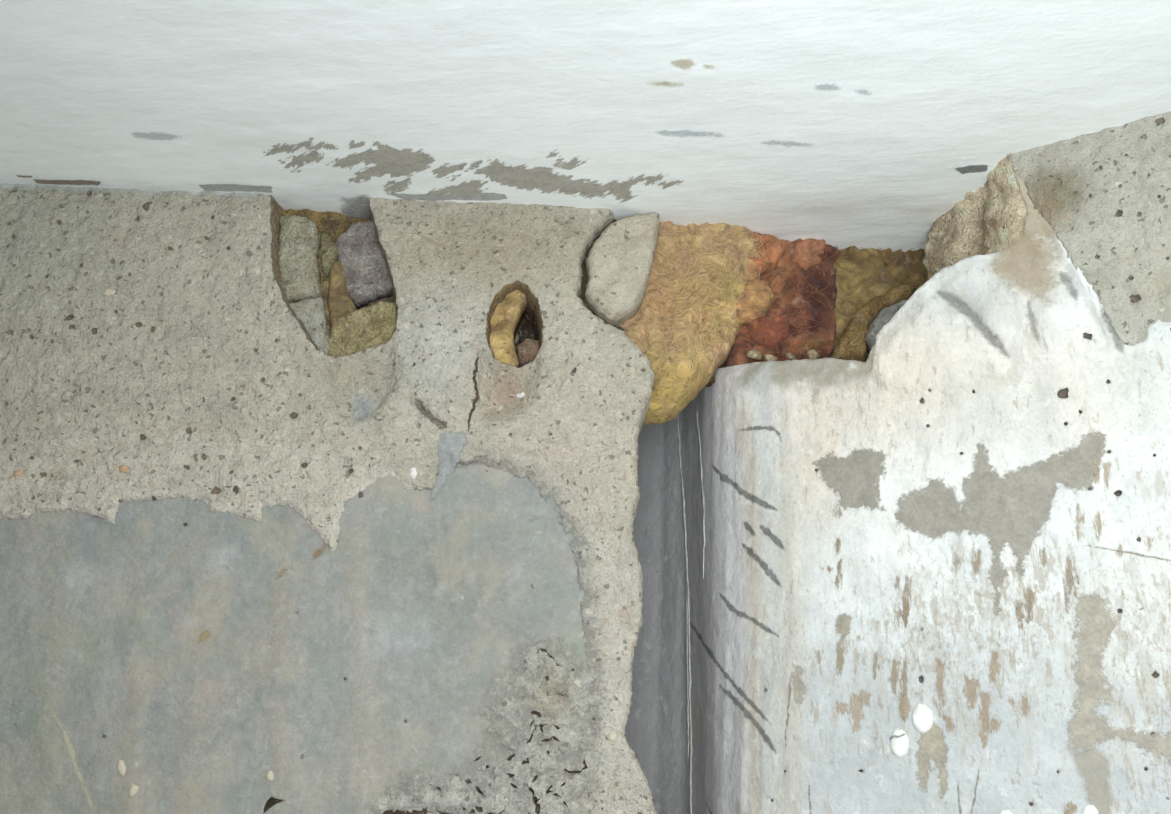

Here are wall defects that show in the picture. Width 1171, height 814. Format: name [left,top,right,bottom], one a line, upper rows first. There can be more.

spalling [922,111,1171,346]
spalling [0,138,684,814]
crack [468,353,479,430]
leakage [812,432,1106,615]
crack [383,647,588,814]
leakage [915,722,949,799]